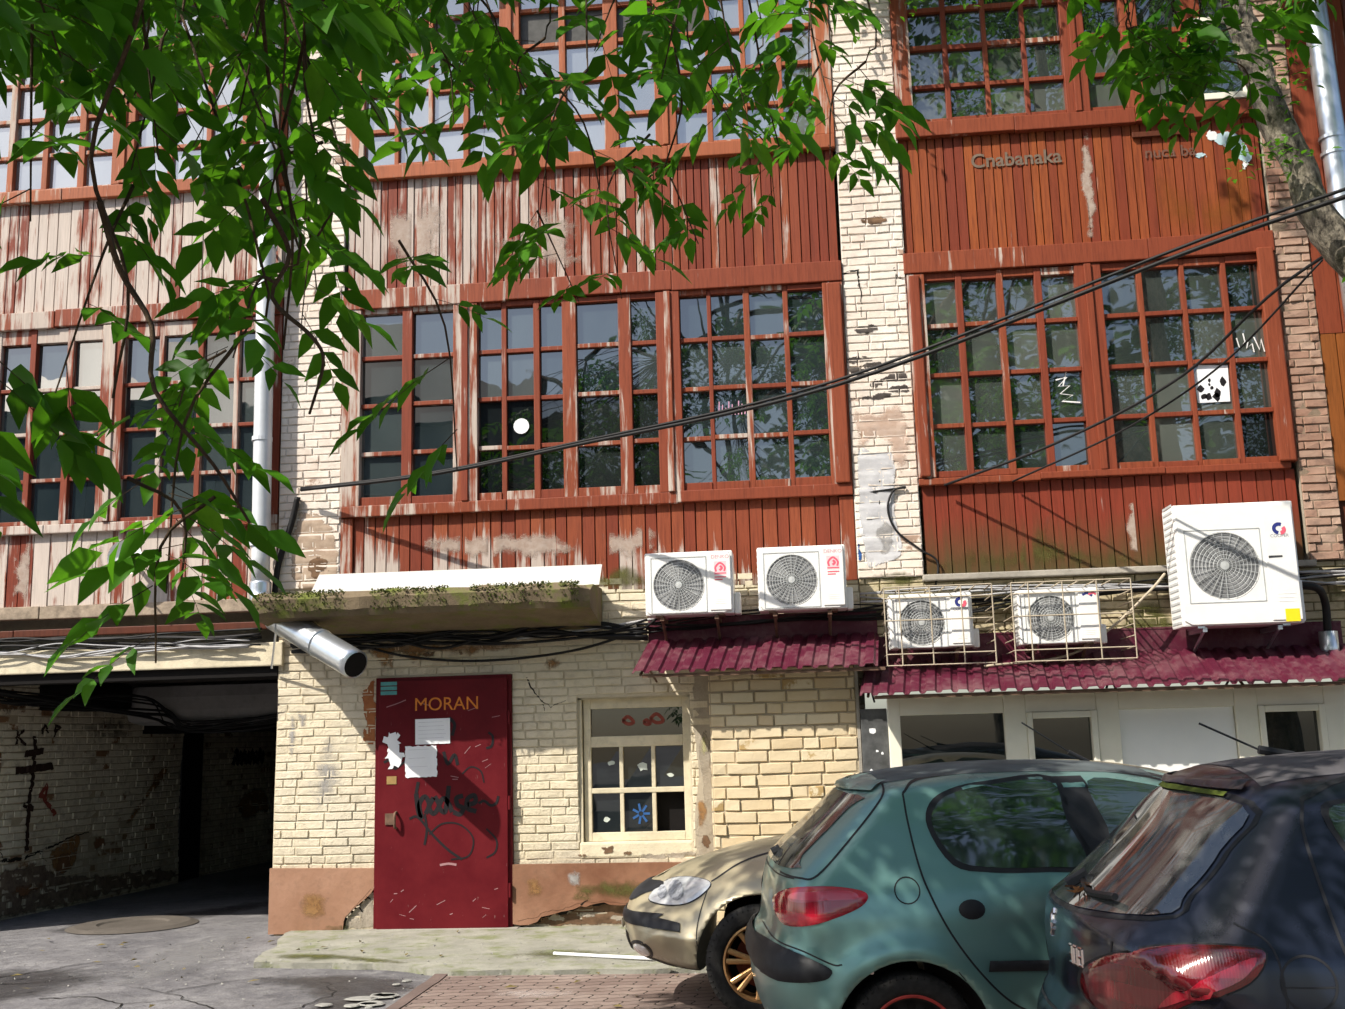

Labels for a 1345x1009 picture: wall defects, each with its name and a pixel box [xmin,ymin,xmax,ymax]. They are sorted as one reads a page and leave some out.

peeling [1081,147,1096,236]
spalling [847,356,909,464]
peeling [424,534,567,557]
peeling [609,530,657,556]
flaking render [0,834,178,918]
crack [1,960,336,1009]